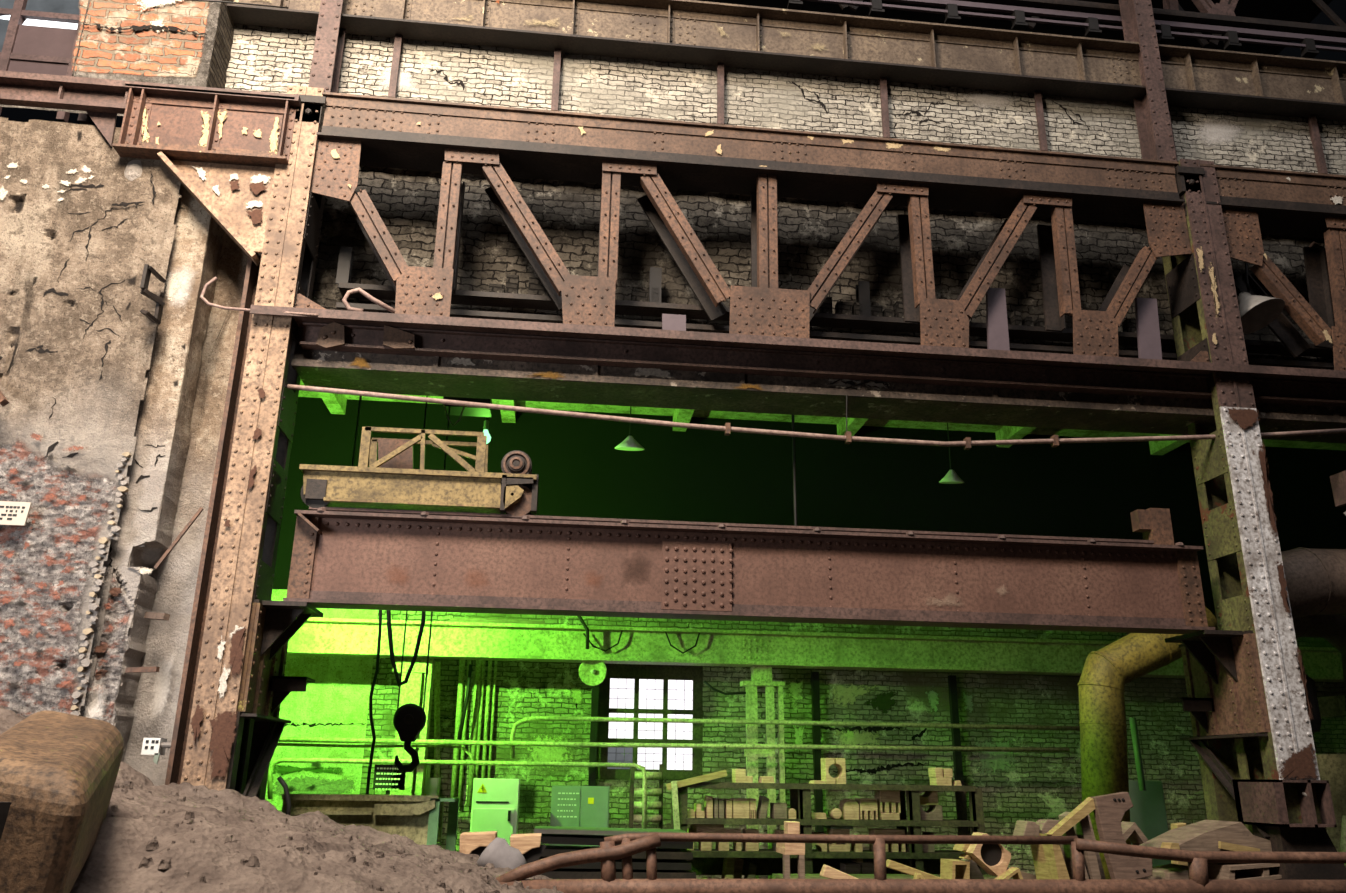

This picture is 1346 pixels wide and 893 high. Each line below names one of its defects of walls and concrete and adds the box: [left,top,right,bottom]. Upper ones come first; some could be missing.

spalling [72,0,209,78]
peeling [141,109,161,145]
peeling [198,109,227,147]
peeling [242,117,280,155]
peeling [0,162,94,213]
crack [0,184,139,380]
corrosion [1227,408,1259,430]
corrosion [1258,443,1279,540]
spalling [0,433,131,723]
corrosion [1276,561,1291,617]
corrosion [1296,648,1313,720]
corrosion [1278,743,1317,780]